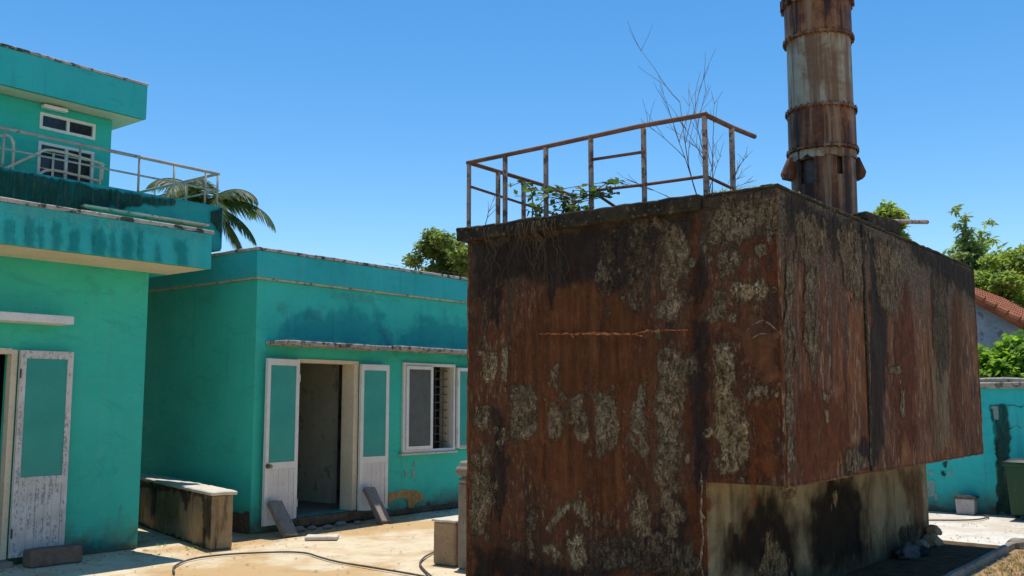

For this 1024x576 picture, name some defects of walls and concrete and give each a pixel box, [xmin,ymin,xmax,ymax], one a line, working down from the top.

crack [537,329,688,338]
peeling [467,191,906,576]
rust [793,385,849,483]
water stain [775,194,889,576]
rust [892,283,918,459]
spalling [388,461,430,508]
rust [688,481,712,571]